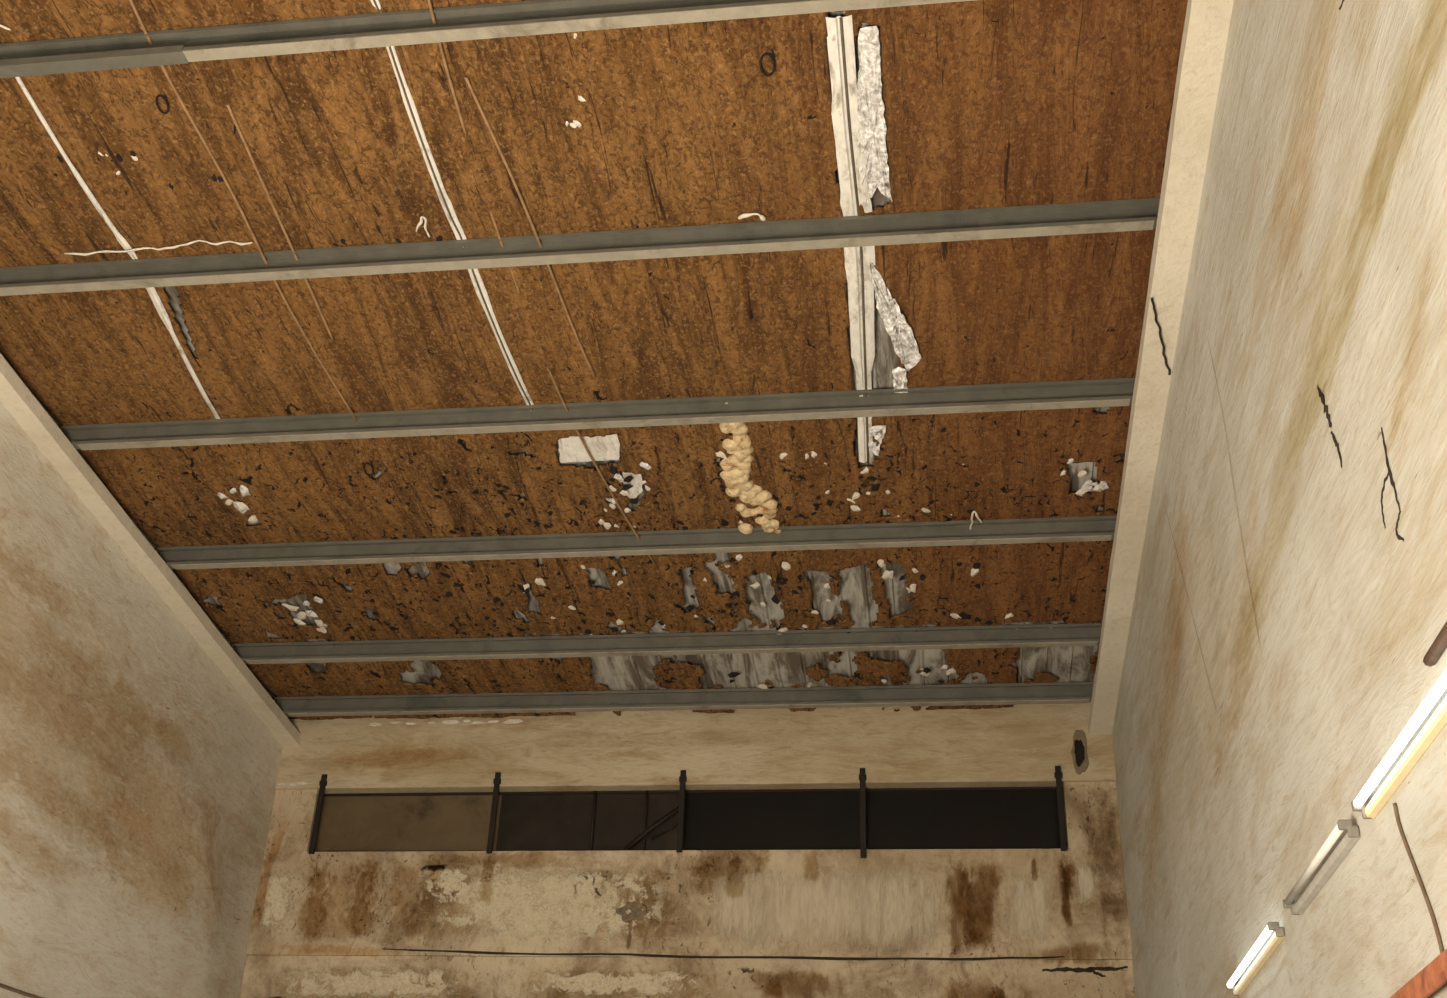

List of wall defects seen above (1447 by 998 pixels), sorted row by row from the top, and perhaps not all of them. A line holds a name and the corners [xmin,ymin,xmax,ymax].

crack [1317,386,1342,468]
peeling [574,462,657,531]
crack [1381,427,1404,542]
peeling [675,554,850,635]
peeling [877,559,926,632]
peeling [950,599,1013,625]
peeling [915,665,956,683]
damp [262,873,291,930]
damp [424,868,662,939]
damp [718,870,934,945]
damp [276,969,463,998]
damp [530,971,710,996]